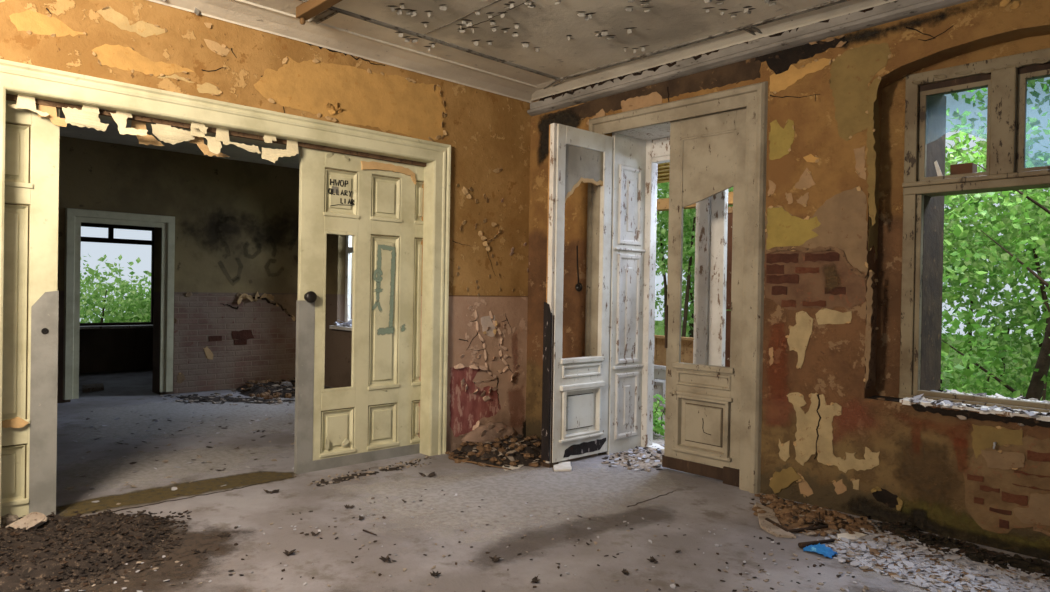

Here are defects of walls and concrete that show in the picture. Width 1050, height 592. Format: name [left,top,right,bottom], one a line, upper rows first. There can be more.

peeling [9,10,87,37]
peeling [97,6,168,37]
peeling [194,8,230,56]
peeling [388,3,447,28]
peeling [456,0,540,52]
peeling [8,94,299,163]
peeling [92,44,222,96]
peeling [254,56,447,142]
flaking render [173,292,298,394]
peeling [450,363,501,437]
crack [813,394,821,459]
water stain [848,441,1050,561]